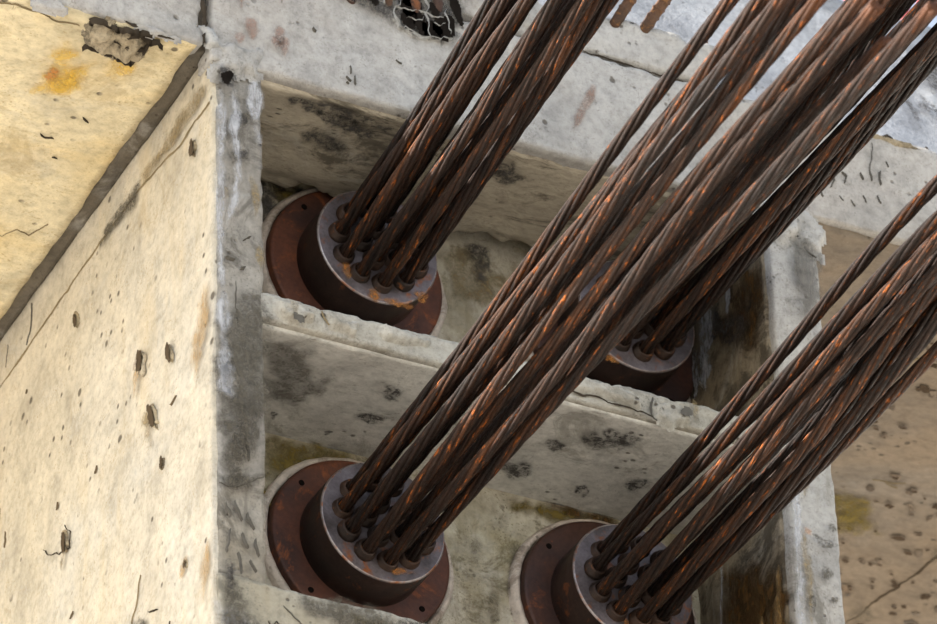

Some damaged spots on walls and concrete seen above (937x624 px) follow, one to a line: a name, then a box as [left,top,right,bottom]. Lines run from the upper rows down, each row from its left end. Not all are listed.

spalling [81,16,163,67]
rust [36,50,86,93]
leakage [248,83,262,119]
leakage [288,97,392,150]
leakage [216,101,241,283]
leakage [494,163,524,184]
crack [0,224,48,237]
leakage [193,293,349,487]
leakage [384,386,401,400]
leakage [358,414,384,424]
leakage [829,495,872,535]
leakage [720,487,833,624]